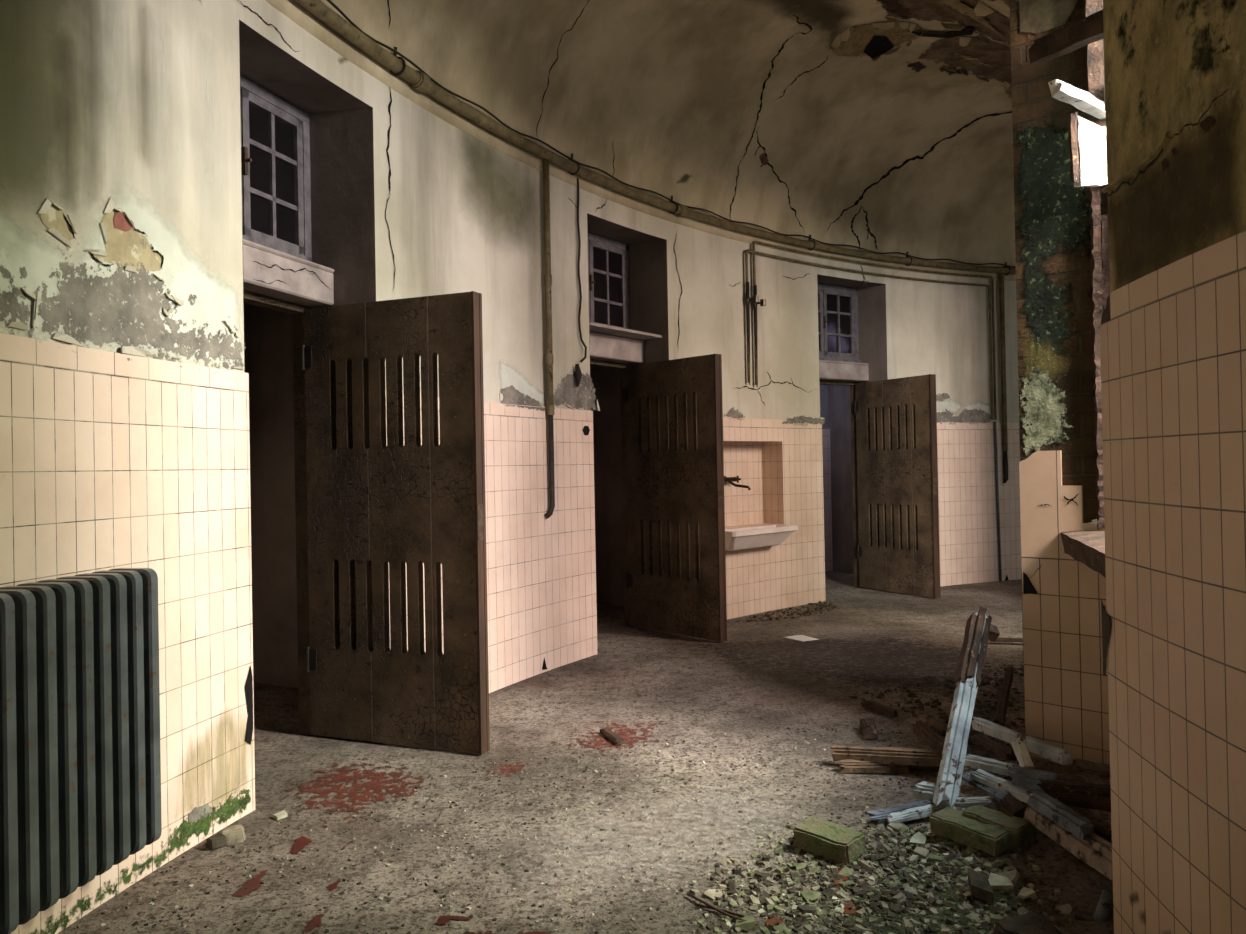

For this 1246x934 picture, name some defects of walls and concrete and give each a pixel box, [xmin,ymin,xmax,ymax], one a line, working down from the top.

crack [238,0,298,52]
crack [535,0,589,143]
flaking render [825,0,1012,99]
water stain [1163,0,1224,73]
crack [730,15,1012,285]
crack [1101,87,1232,196]
flaking render [0,197,246,372]